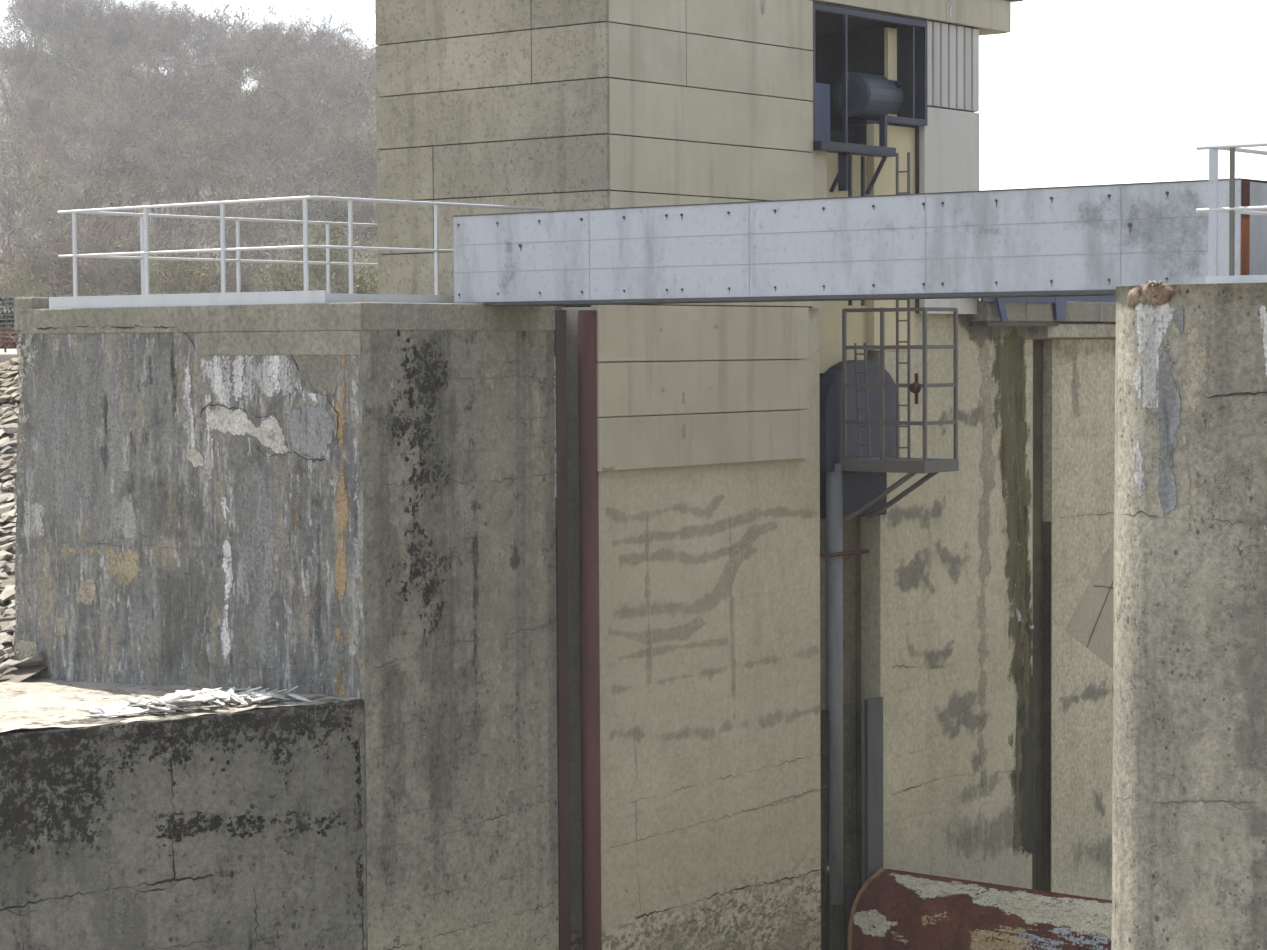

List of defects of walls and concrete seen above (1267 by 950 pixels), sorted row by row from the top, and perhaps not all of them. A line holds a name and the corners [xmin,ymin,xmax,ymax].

efflorescence [1125,302,1174,412]
efflorescence [1259,305,1267,377]
crack [1206,391,1267,399]
peeling [186,447,204,467]
peeling [206,404,336,459]
efflorescence [1133,431,1146,496]
damp [1018,506,1037,855]
crack [0,757,220,950]
crack [356,705,558,950]
crack [1123,797,1253,810]